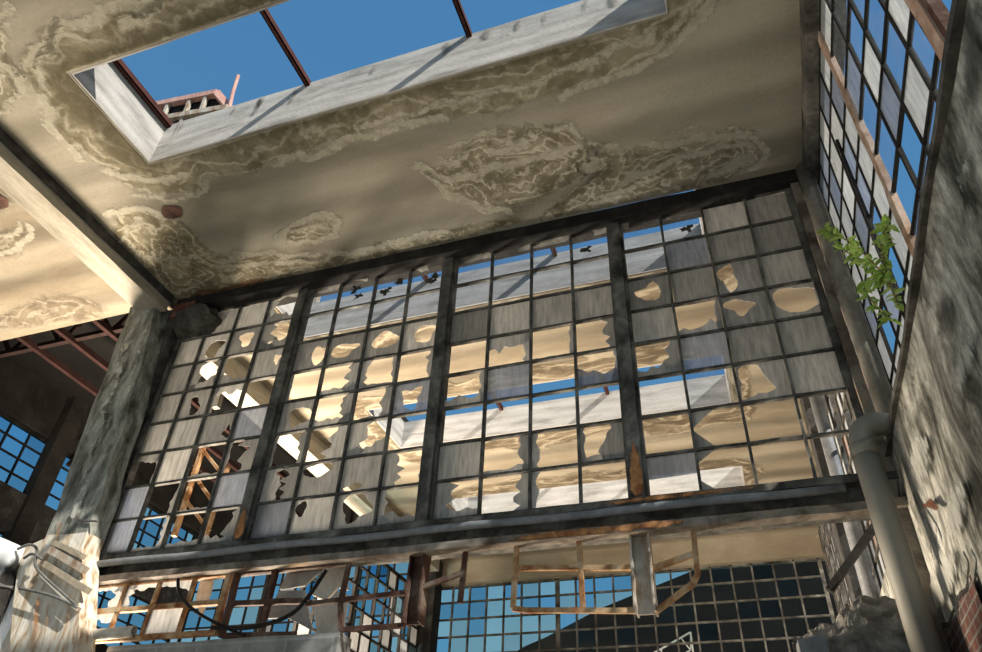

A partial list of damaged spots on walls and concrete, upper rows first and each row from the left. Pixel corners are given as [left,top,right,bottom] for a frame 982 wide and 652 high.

water stain [0,0,770,301]
water stain [274,308,290,336]
water stain [303,313,437,358]
water stain [455,280,610,312]
corrosion [609,442,754,504]
corrosion [515,520,681,540]
peeling [947,481,965,539]
flaking render [931,551,982,652]